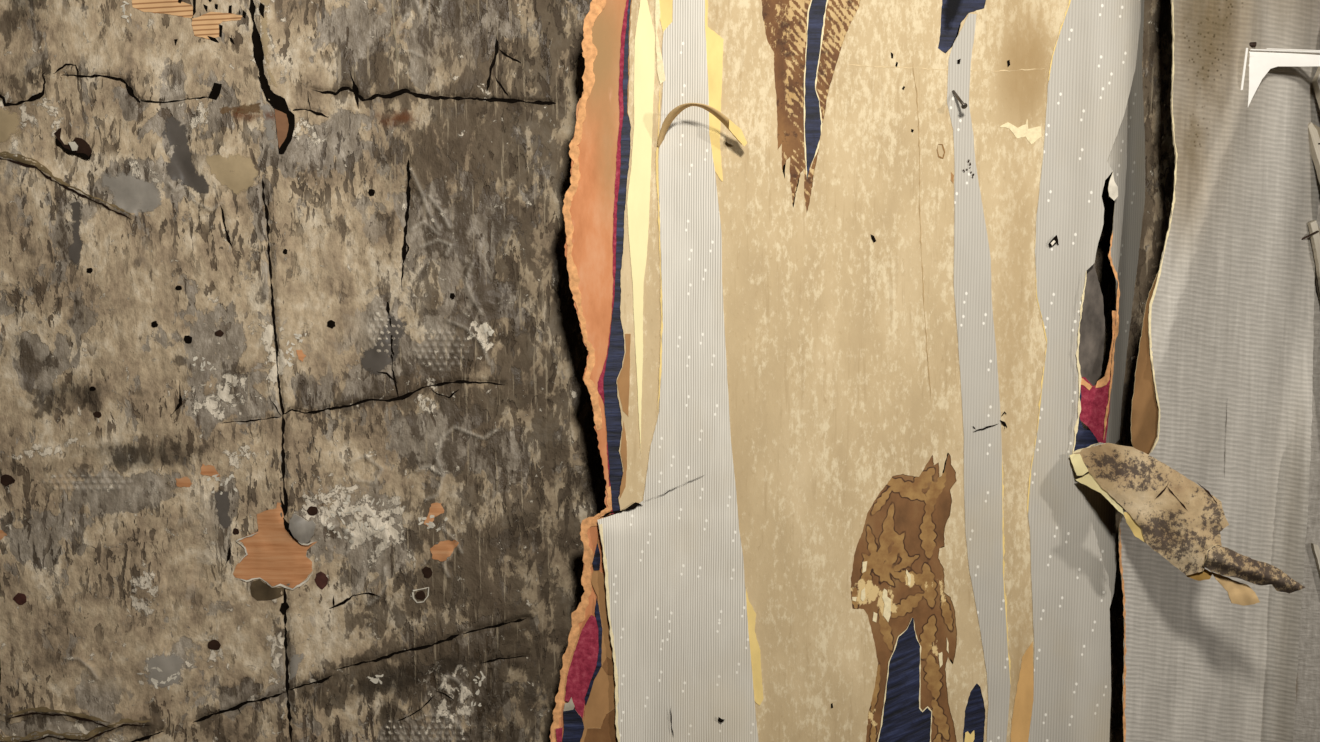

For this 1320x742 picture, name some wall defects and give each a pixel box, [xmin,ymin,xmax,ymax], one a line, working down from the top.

crack [0,63,206,106]
spalling [121,0,277,87]
peeling [220,103,275,150]
crack [249,0,270,92]
crack [293,37,556,117]
peeling [657,103,747,148]
crack [220,205,232,247]
crack [224,158,502,516]
spalling [175,464,386,601]
peeling [1069,443,1305,606]
peeling [852,561,891,622]
crack [194,588,526,742]